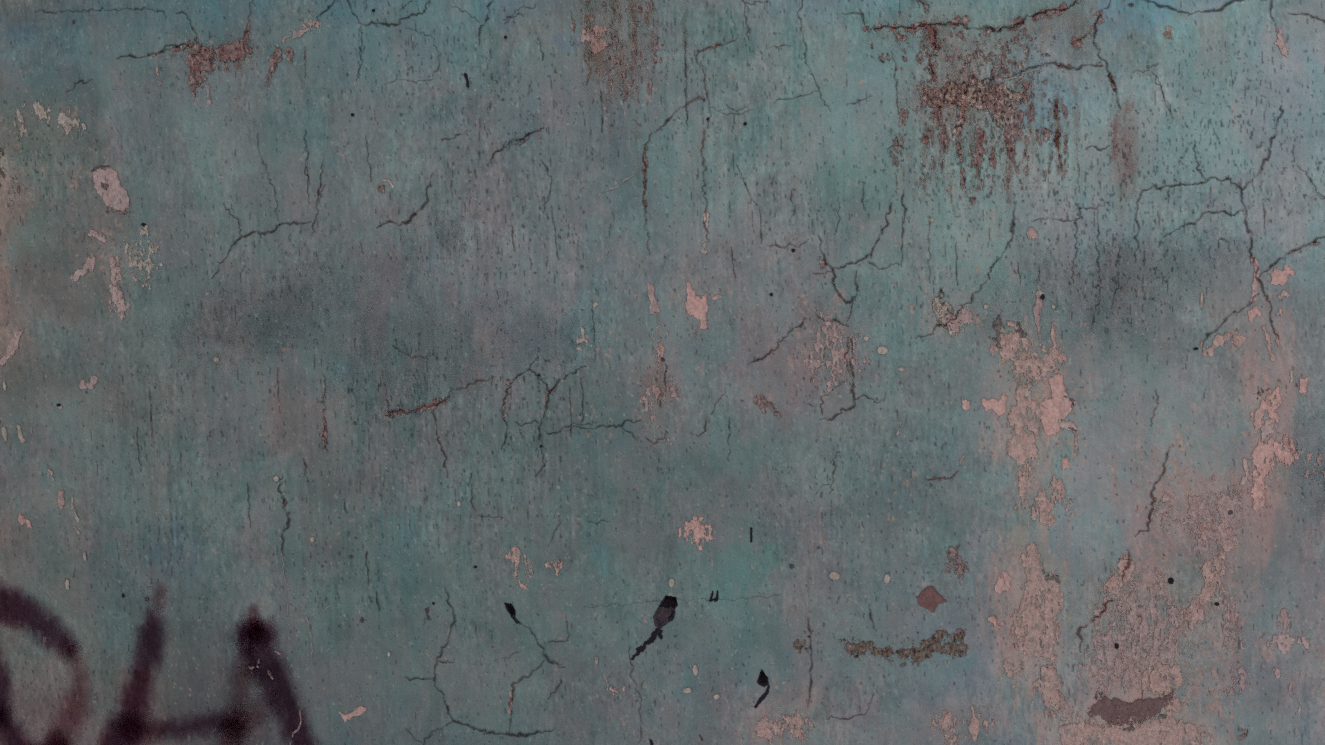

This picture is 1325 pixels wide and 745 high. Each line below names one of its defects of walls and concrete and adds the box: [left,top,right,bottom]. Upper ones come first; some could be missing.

crack [859,0,1120,108]
crack [1150,0,1325,22]
peeling [91,165,130,214]
peeling [70,222,163,321]
peeling [684,282,722,329]
crack [753,199,1040,362]
crack [1066,111,1324,344]
peeling [1194,255,1296,361]
crack [501,311,638,468]
peeling [679,516,713,553]
peeling [931,287,1325,745]
crack [408,592,564,742]